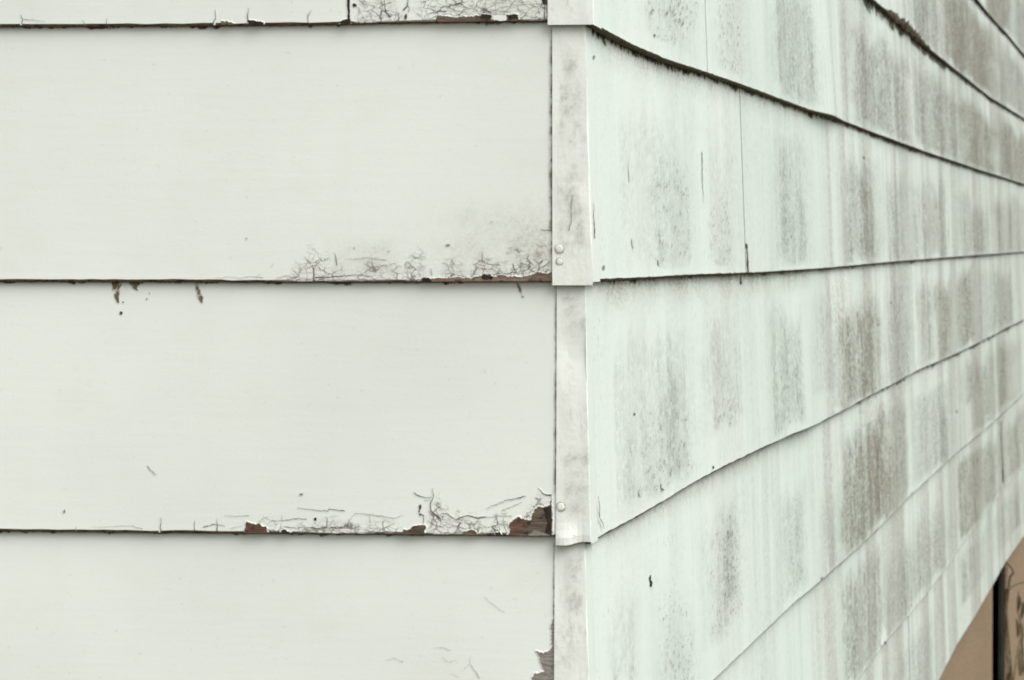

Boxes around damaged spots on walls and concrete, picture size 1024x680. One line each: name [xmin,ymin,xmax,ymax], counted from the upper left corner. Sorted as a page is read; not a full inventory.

peeling [435,13,520,22]
water stain [592,0,1024,187]
peeling [421,271,552,282]
water stain [834,172,1022,552]
peeling [243,520,293,533]
peeling [401,524,428,535]
peeling [495,494,555,536]
peeling [530,616,554,680]